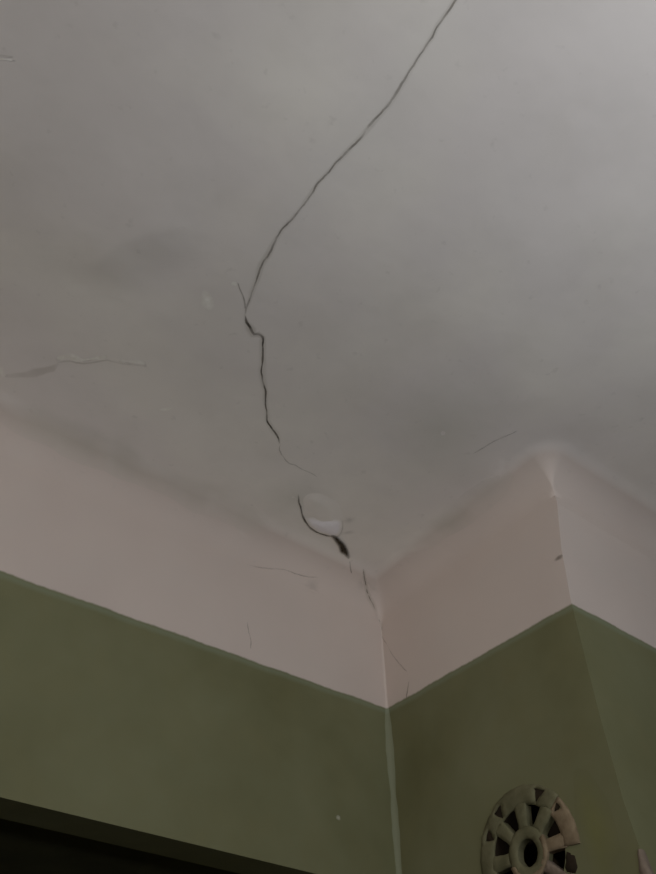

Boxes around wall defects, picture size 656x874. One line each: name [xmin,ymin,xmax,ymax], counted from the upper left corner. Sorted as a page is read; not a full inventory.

crack [243,0,459,443]
crack [344,569,384,633]